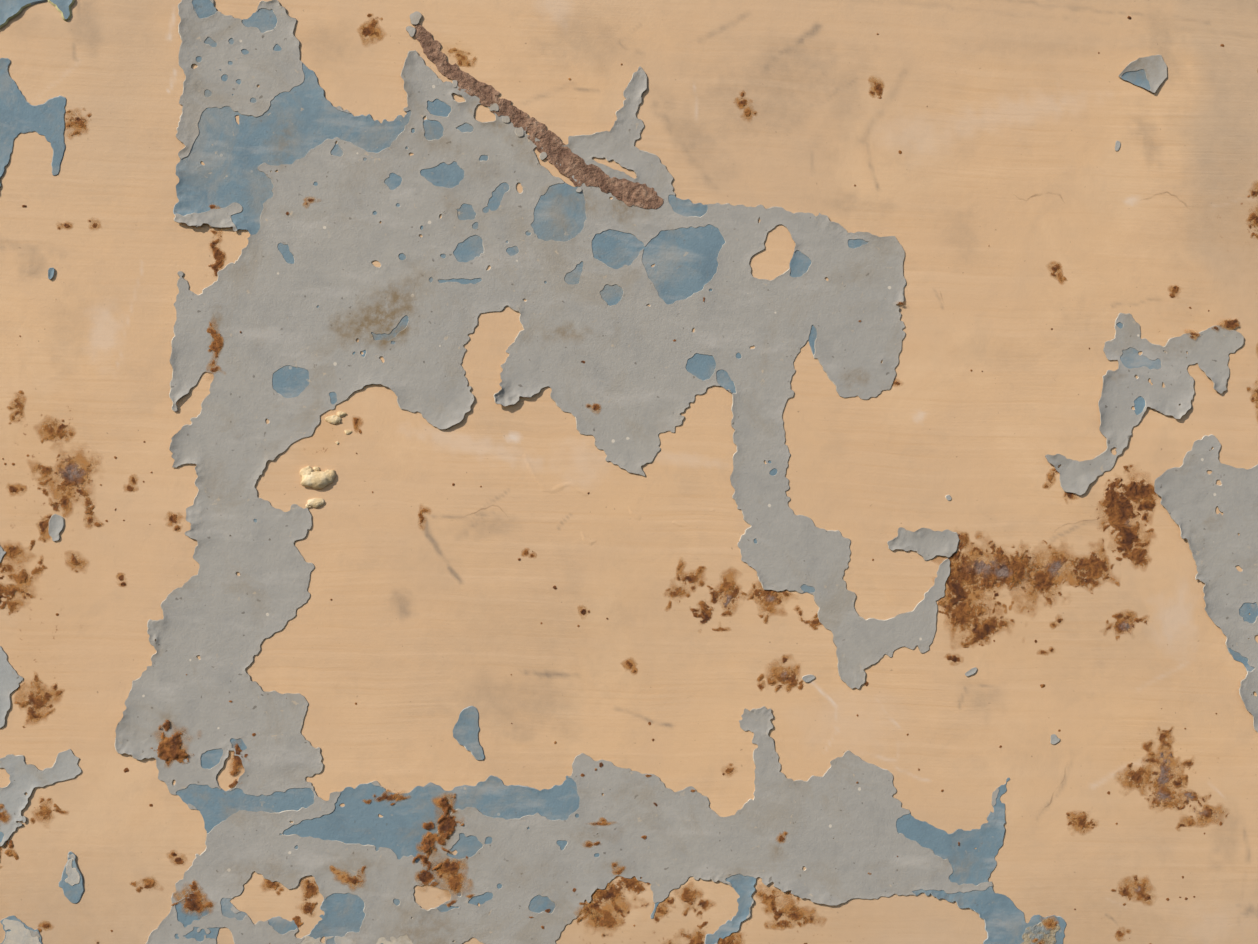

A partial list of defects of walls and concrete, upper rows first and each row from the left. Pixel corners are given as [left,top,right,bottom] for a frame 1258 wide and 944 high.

peeling [0,58,67,186]
corrosion [406,11,663,209]
peeling [1118,55,1167,93]
corrosion [0,419,125,615]
peeling [115,0,1067,944]
corrosion [666,561,821,631]
corrosion [938,465,1156,663]
peeling [1045,313,1244,496]
peeling [1154,434,1258,733]
peeling [0,749,81,847]
corrosion [412,794,473,907]
corrosion [573,863,742,944]